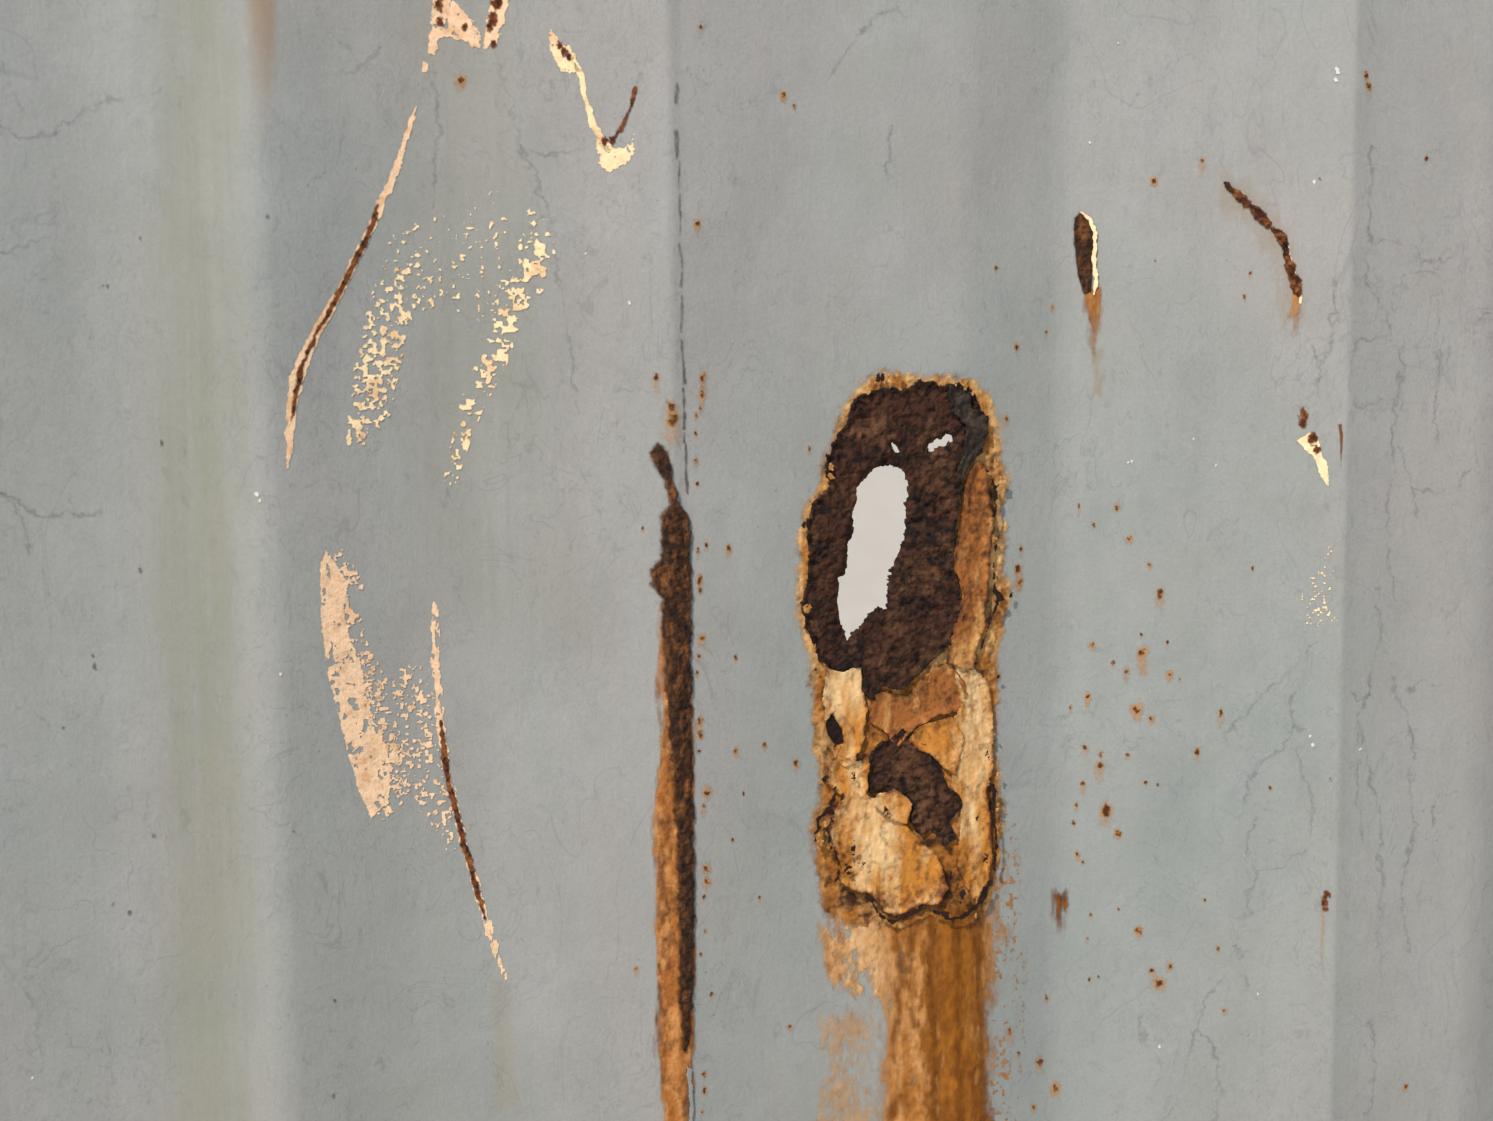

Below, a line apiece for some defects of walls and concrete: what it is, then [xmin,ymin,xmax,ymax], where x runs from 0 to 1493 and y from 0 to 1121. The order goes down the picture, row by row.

corrosion [1074,211,1101,340]
peeling [346,191,555,485]
corrosion [667,372,705,435]
peeling [1297,407,1329,486]
corrosion [1111,633,1147,674]
peeling [320,549,460,850]
corrosion [641,443,713,1121]
corrosion [793,369,1043,1121]
corrosion [1101,802,1122,838]
corrosion [1130,705,1154,721]
corrosion [1053,892,1068,923]
corrosion [1149,963,1172,989]